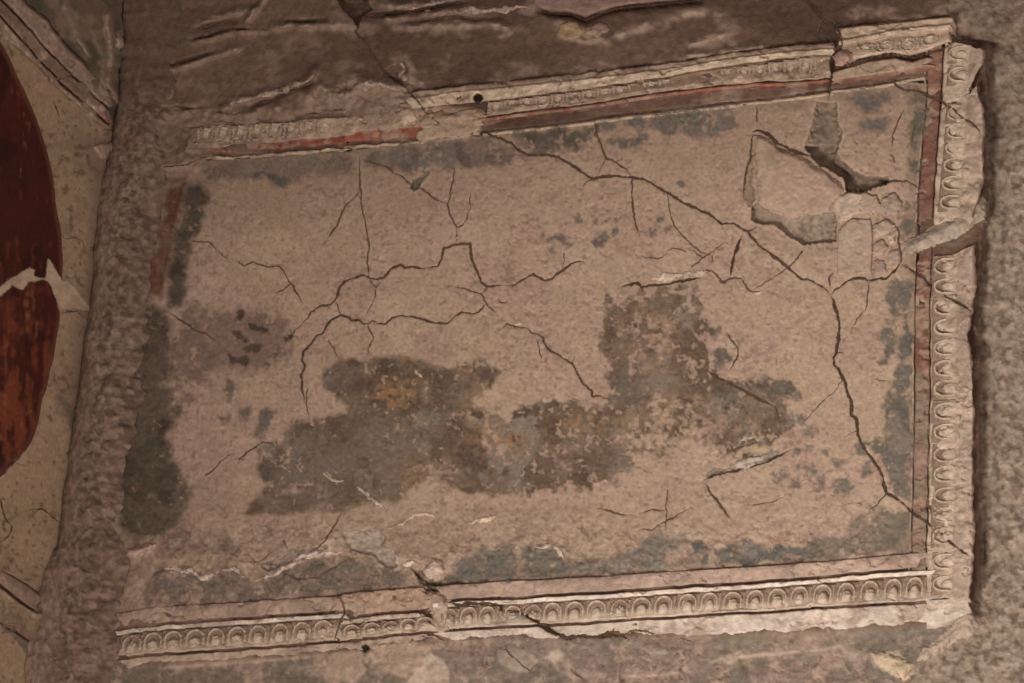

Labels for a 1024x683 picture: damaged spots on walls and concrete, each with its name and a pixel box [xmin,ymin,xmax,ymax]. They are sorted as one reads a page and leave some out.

crack [170,20,249,66]
crack [170,85,310,115]
flaking render [337,62,408,97]
flaking render [743,102,889,245]
flaking render [0,259,90,312]
crack [167,160,606,416]
crack [352,0,980,556]
water stain [120,186,293,548]
water stain [714,348,732,368]
water stain [717,378,795,407]
crack [323,472,385,509]
crack [411,567,691,642]